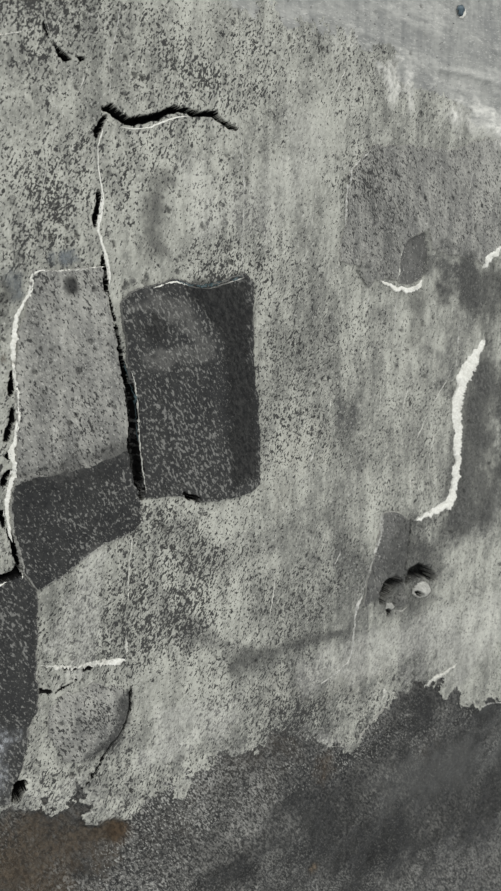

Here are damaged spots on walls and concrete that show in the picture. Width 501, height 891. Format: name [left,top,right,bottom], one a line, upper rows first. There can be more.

peeling [0,266,261,806]
crack [0,0,263,586]
flaking render [338,137,501,294]